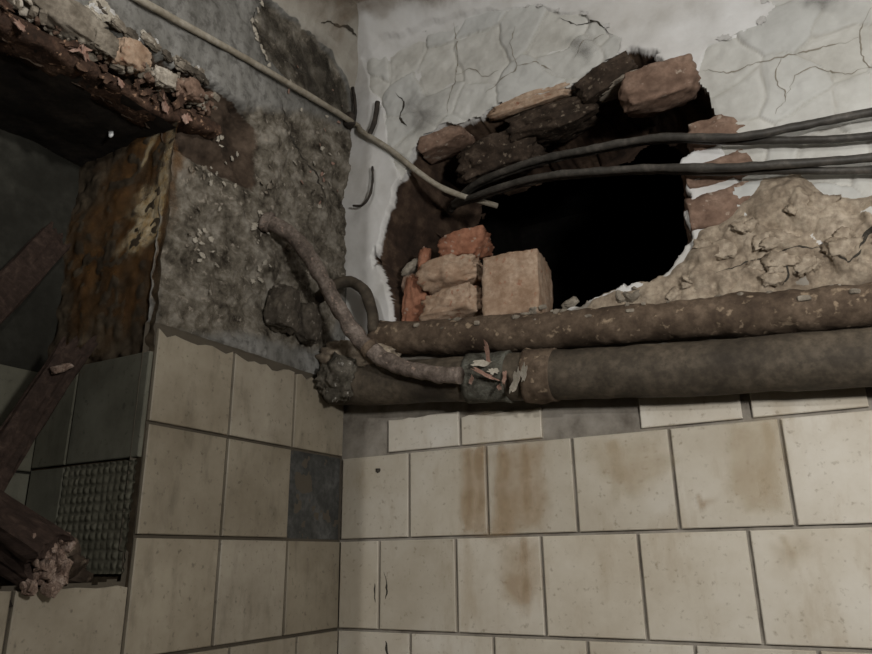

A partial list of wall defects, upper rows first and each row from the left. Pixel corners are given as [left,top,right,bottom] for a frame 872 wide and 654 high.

peeling [84,0,210,87]
crack [397,95,407,126]
peeling [366,3,622,180]
crack [447,27,551,112]
crack [561,18,613,56]
crack [706,8,872,114]